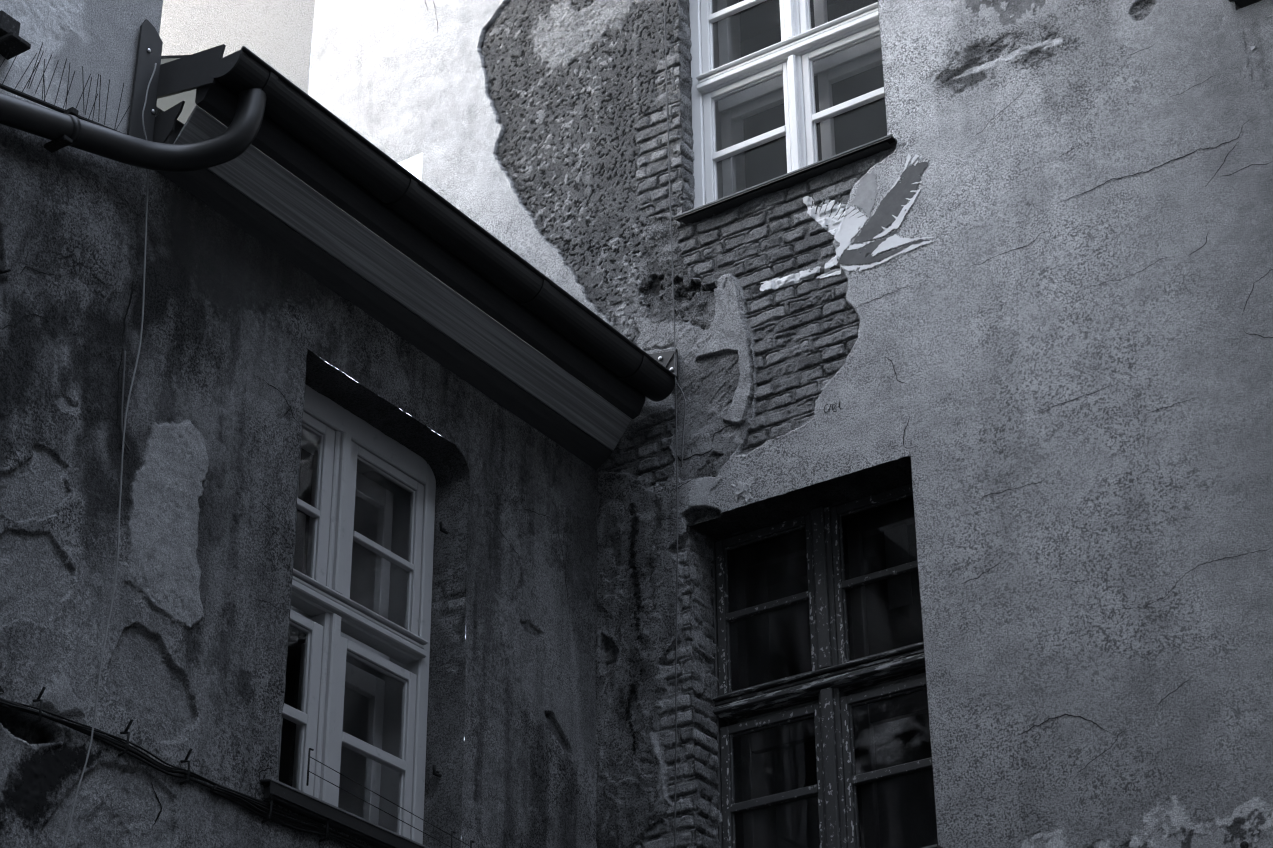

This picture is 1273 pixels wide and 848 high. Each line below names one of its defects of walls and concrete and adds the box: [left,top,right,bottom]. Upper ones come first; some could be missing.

spalling [926,0,1087,102]
flaking render [1128,0,1158,23]
crack [1060,120,1273,202]
crack [1242,269,1273,338]
flaking render [477,0,901,848]
flaking render [0,441,78,633]
flaking render [122,418,209,630]
flaking render [0,700,65,750]
crack [1014,714,1129,773]
flaking render [41,759,179,848]
peeling [1017,788,1273,848]